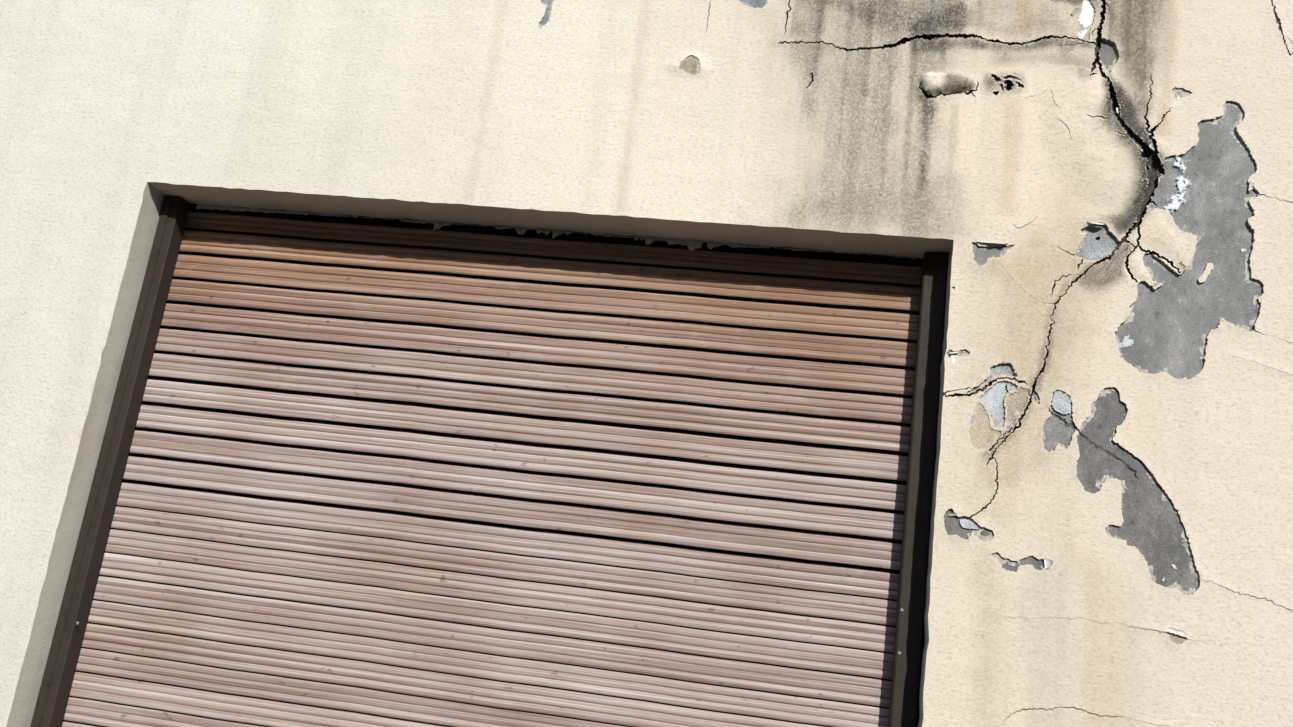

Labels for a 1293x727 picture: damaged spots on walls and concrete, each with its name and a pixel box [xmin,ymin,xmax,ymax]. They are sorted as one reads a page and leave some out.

peeling [739,0,768,8]
damp [852,0,996,51]
damp [1119,0,1156,111]
crack [778,0,1181,520]
peeling [972,241,1014,267]
peeling [1075,221,1120,260]
peeling [1115,101,1264,379]
peeling [968,362,1201,595]
peeling [944,508,1053,572]
crack [1198,578,1293,612]